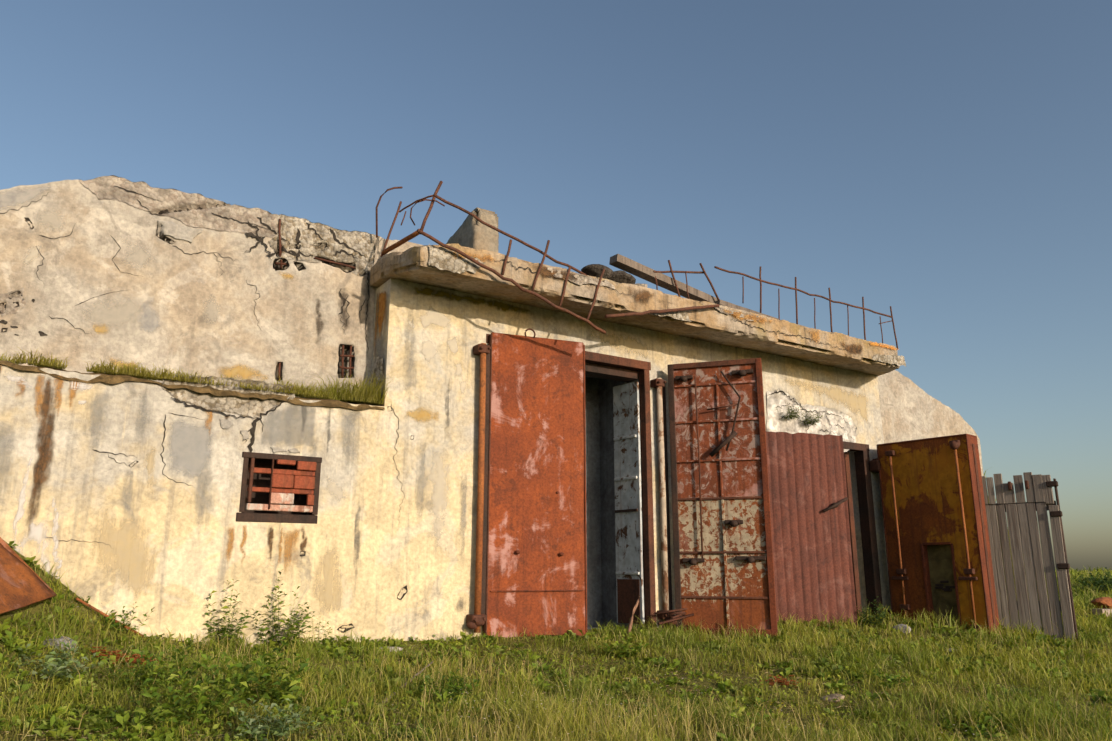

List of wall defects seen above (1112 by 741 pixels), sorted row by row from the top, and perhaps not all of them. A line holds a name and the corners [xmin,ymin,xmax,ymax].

spalling [79,175,375,277]
spalling [0,287,35,336]
spalling [338,289,355,378]
corrosion [374,293,386,346]
spalling [429,244,485,274]
corrosion [537,266,577,280]
spalling [546,267,615,289]
corrosion [630,290,654,302]
spalling [651,311,692,322]
spalling [370,355,392,411]